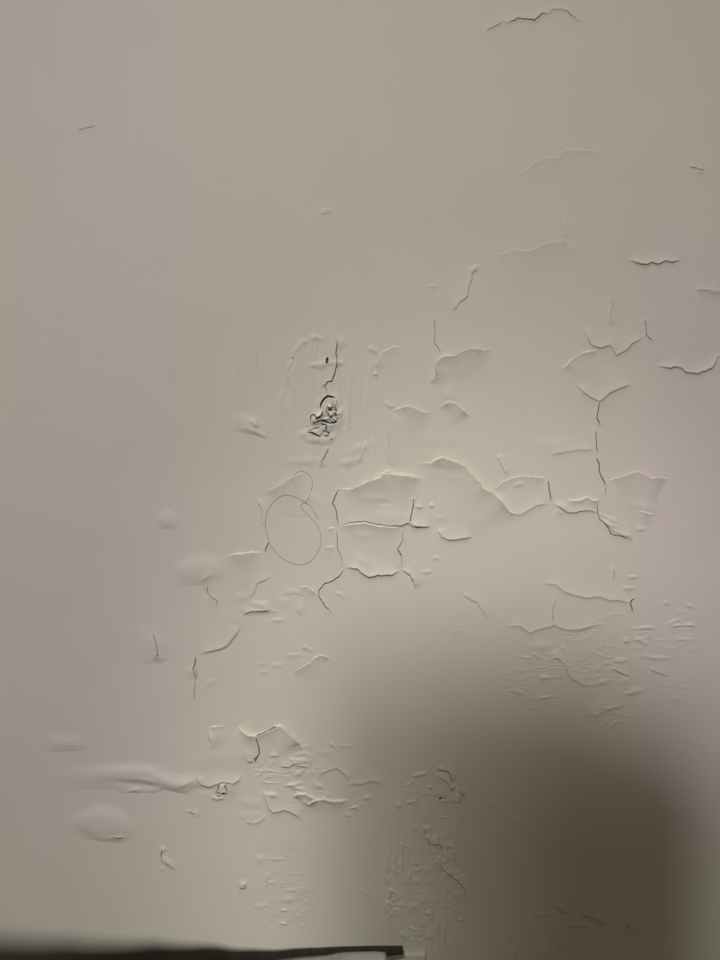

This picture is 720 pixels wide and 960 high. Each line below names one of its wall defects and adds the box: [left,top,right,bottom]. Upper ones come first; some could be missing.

crack [478,0,591,39]
crack [317,329,343,396]
crack [587,403,614,502]
peeling [186,717,387,830]